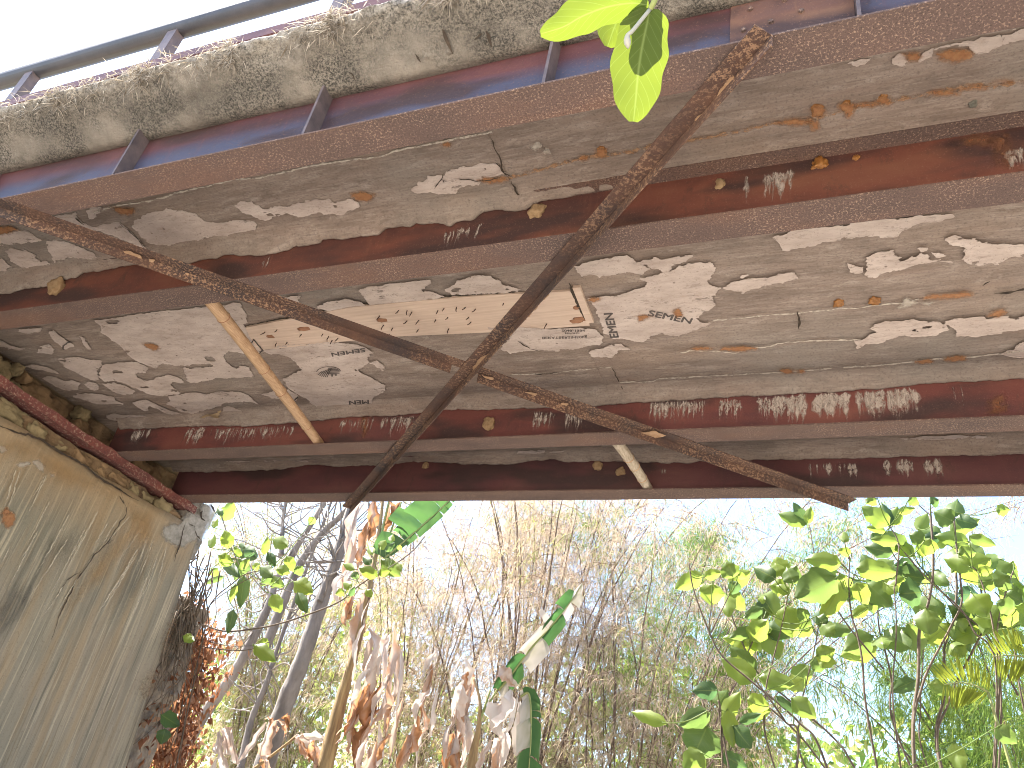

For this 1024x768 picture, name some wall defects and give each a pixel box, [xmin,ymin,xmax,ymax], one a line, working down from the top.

crack [434,133,519,195]
peeling [411,142,651,195]
efflorescence [764,170,792,195]
peeling [54,199,360,249]
peeling [773,214,1024,278]
peeling [501,255,798,358]
peeling [854,298,1024,358]
peeling [0,302,385,421]
efflorescence [650,401,703,417]
efflorescence [756,387,919,418]
efflorescence [883,459,941,475]
crack [0,426,138,637]